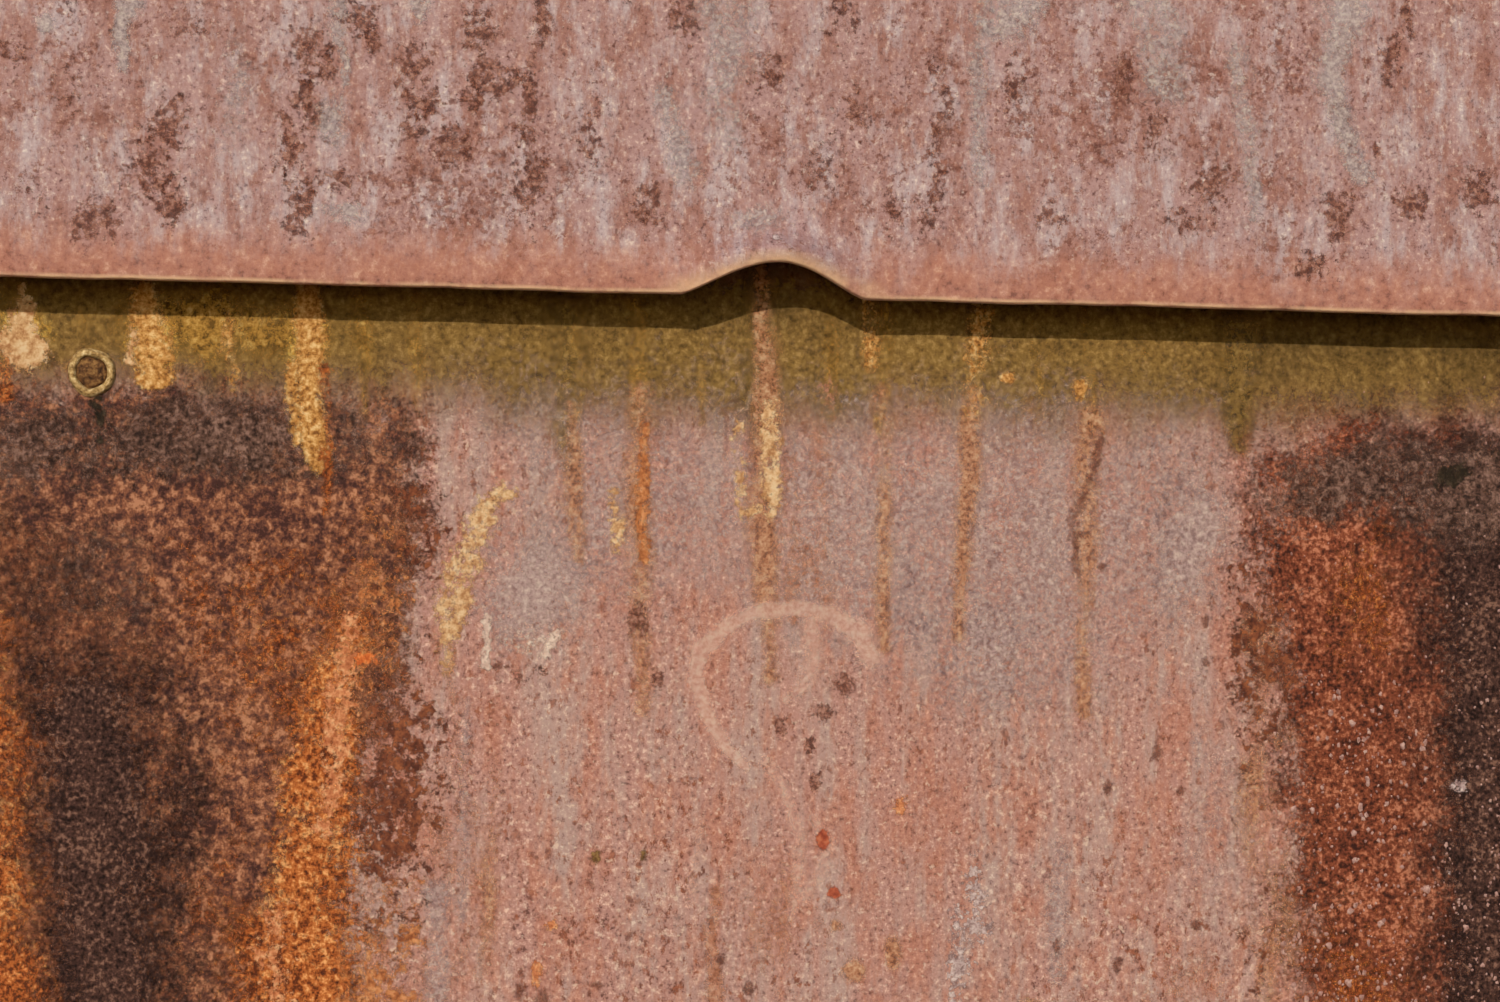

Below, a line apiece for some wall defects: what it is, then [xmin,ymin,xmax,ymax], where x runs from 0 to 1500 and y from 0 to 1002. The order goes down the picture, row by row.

leakage [0,282,52,403]
rust [67,89,198,244]
leakage [124,280,176,390]
leakage [284,285,336,518]
rust [272,0,554,240]
rust [729,263,834,683]
rust [884,56,954,237]
leakage [1222,313,1256,453]
rust [1295,187,1357,281]
rust [0,361,519,1002]
rust [1222,393,1498,1002]
leakage [1250,423,1500,1002]